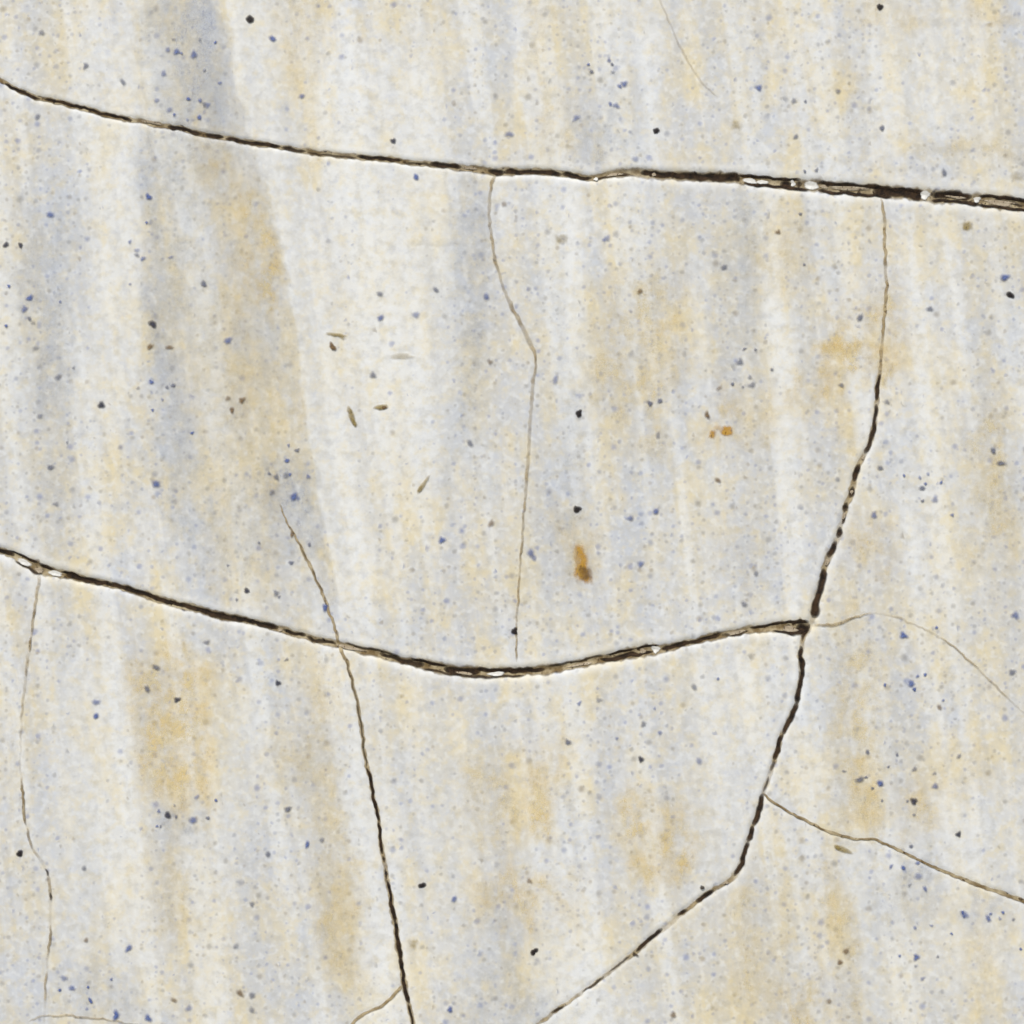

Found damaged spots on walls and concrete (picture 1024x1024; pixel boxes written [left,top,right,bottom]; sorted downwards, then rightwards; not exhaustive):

crack [0,78,1024,264]
crack [0,280,1024,1024]
corrosion [576,547,589,581]